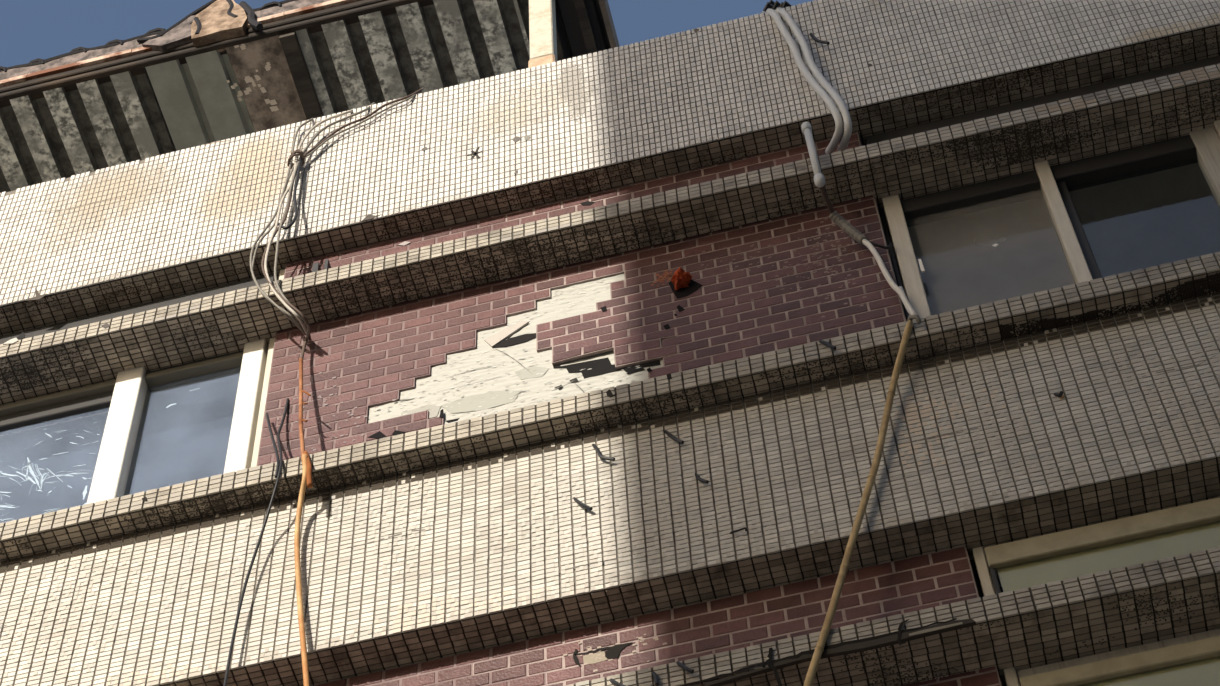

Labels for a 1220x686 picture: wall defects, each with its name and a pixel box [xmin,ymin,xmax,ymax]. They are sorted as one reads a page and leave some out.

damp [824,27,1220,139]
damp [0,160,315,323]
damp [364,155,660,243]
spalling [367,274,672,439]